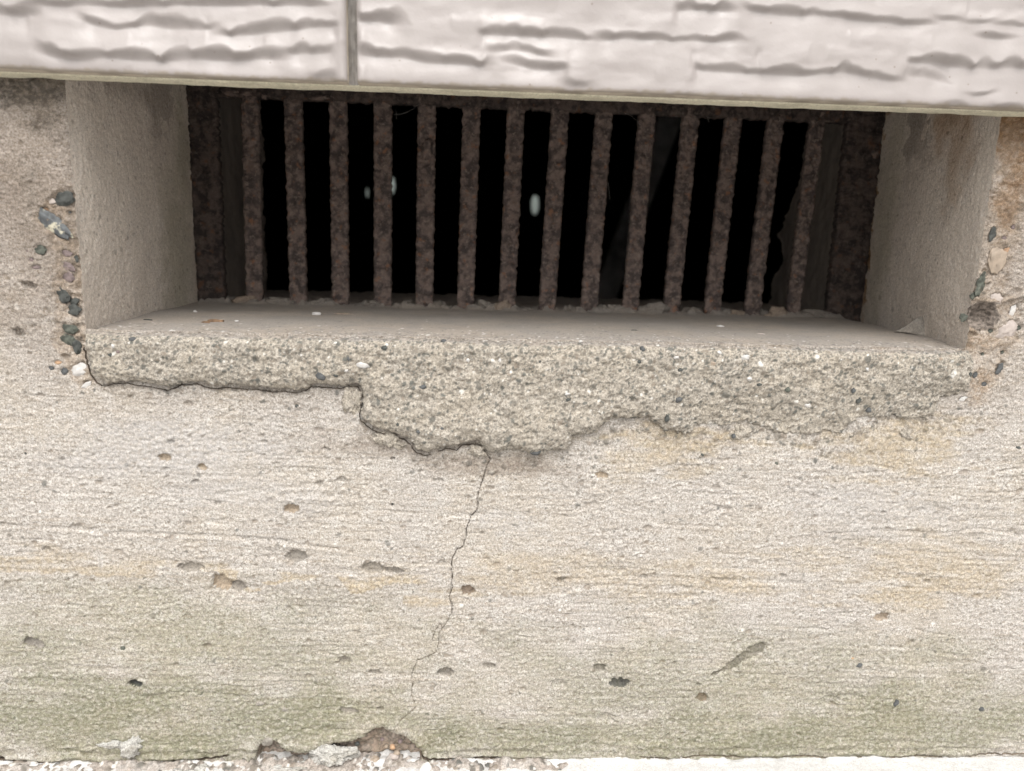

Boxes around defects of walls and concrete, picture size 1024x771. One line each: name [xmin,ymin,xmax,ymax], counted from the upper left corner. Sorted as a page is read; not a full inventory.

corrosion [217,87,268,100]
crack [83,347,491,733]
spalling [258,737,308,755]
spalling [332,727,421,762]